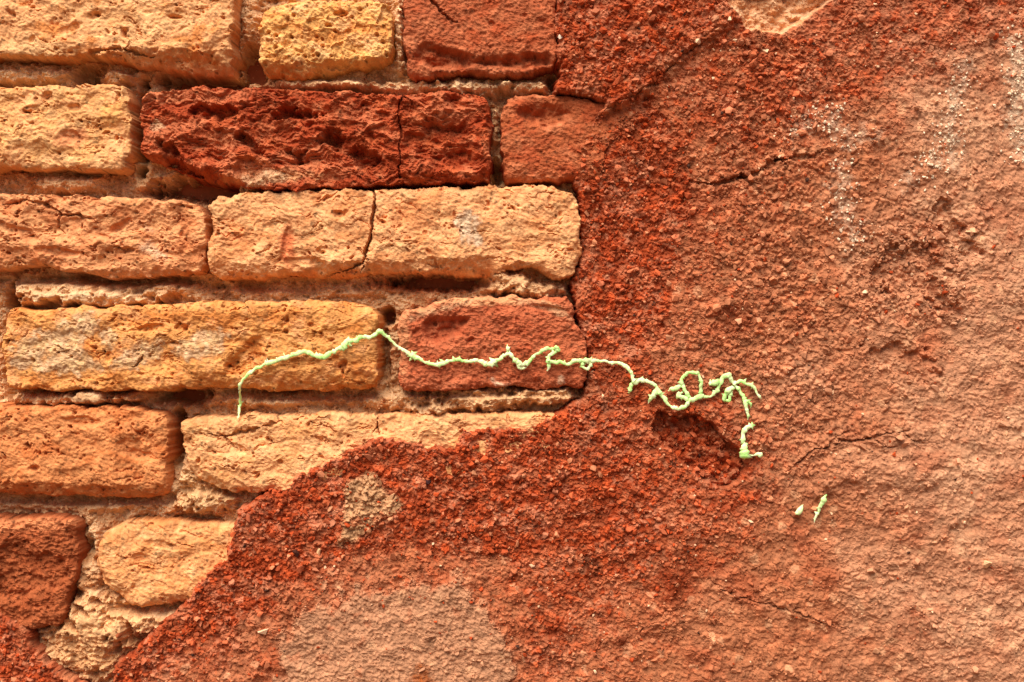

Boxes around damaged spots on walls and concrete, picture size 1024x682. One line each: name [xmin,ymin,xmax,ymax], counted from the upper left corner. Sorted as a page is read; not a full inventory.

spalling [323,9,350,30]
spalling [727,0,834,35]
spalling [323,57,351,75]
spalling [411,40,555,78]
crack [680,148,828,192]
spalling [113,89,751,682]
spalling [62,419,98,431]
spalling [23,464,39,475]
crack [781,428,943,475]
spalling [0,535,80,607]